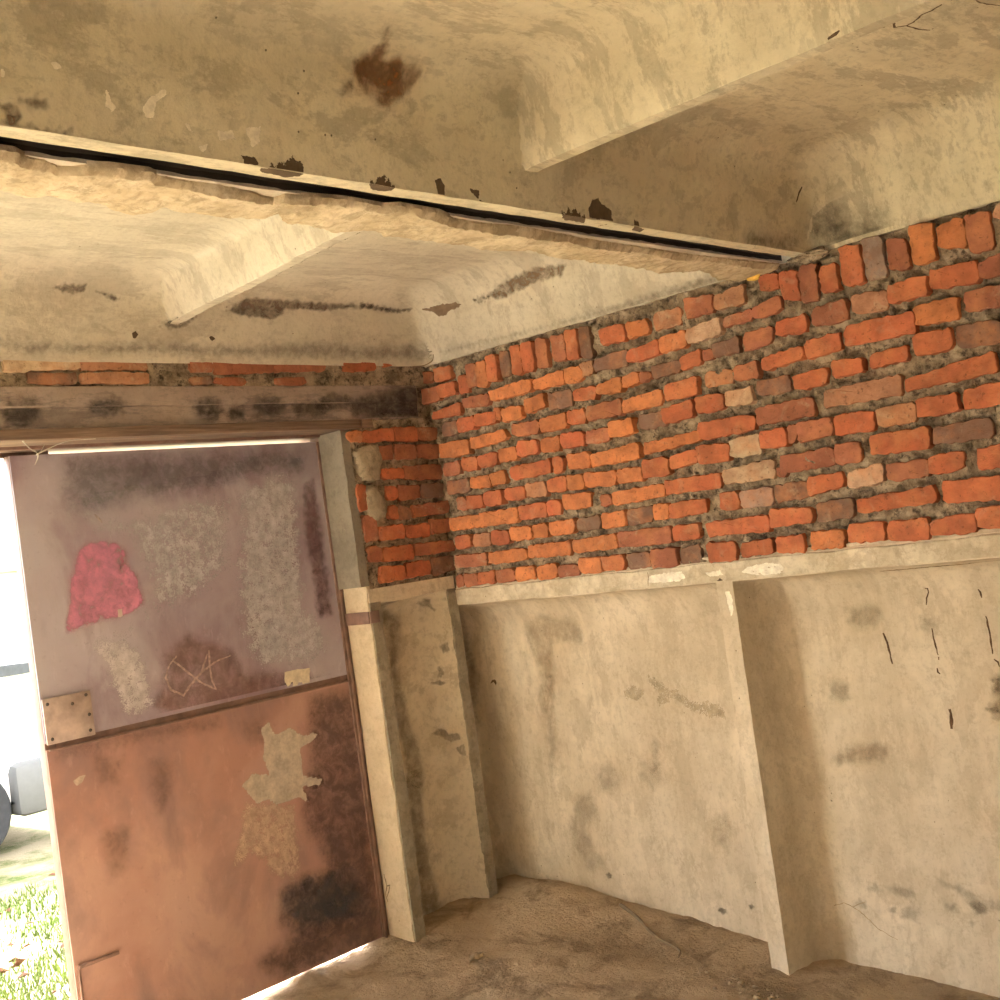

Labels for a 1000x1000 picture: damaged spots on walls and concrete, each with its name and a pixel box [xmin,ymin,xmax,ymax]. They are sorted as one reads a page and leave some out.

crack [883,4,942,30]
rust [345,44,420,105]
peeling [143,89,167,118]
spalling [217,126,304,177]
spalling [369,176,395,191]
spalling [435,178,445,195]
spalling [562,198,613,226]
damp [473,265,564,302]
damp [231,298,411,319]